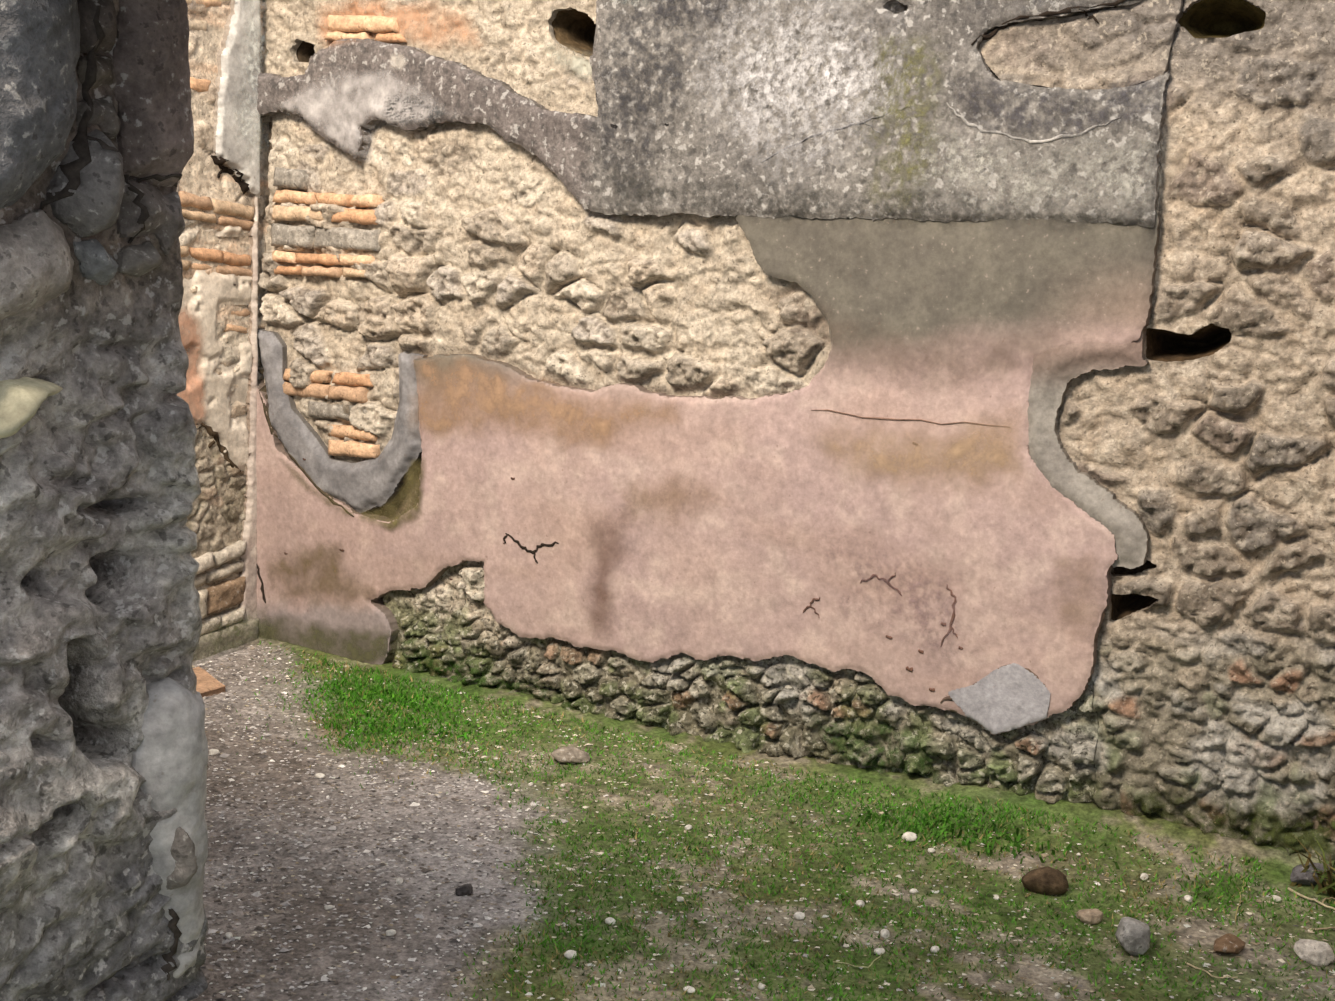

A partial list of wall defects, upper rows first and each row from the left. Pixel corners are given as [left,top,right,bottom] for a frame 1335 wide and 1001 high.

spalling [186,0,222,31]
spalling [261,0,598,117]
spalling [190,77,211,92]
crack [39,5,182,244]
crack [210,155,249,194]
spalling [178,113,831,463]
spalling [383,0,1335,861]
crack [824,409,1008,427]
crack [503,533,558,563]
crack [860,573,902,596]
crack [803,597,820,617]
crack [940,584,958,647]